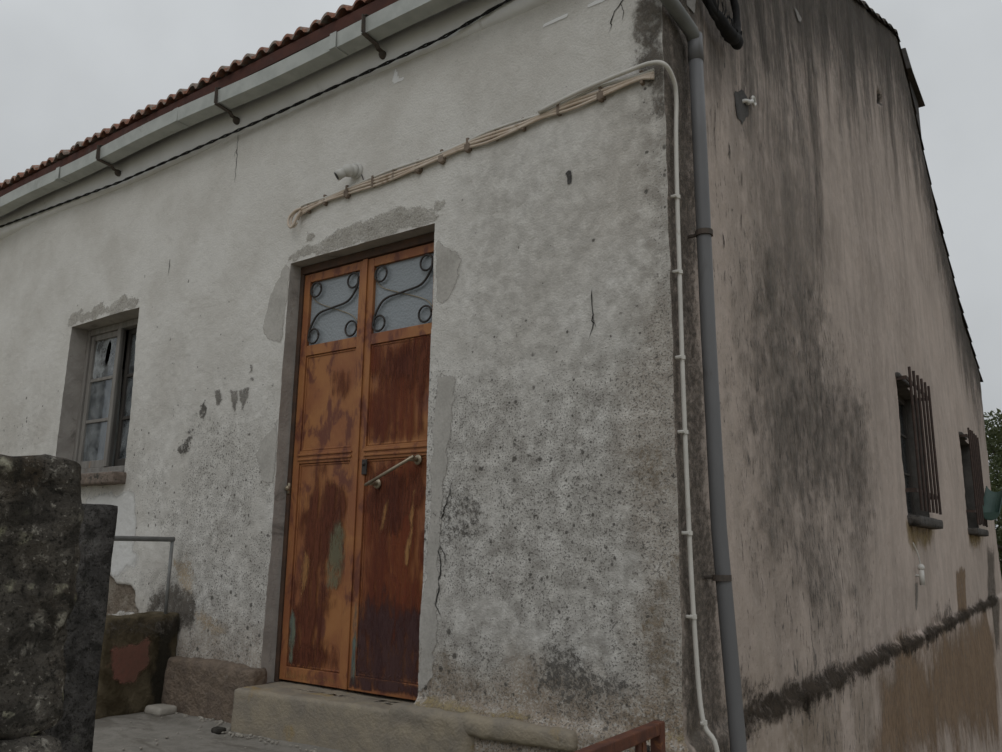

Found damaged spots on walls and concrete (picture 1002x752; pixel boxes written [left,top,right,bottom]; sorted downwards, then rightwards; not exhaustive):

damp [716,0,983,404]
crack [435,483,452,614]
flaking render [106,575,139,615]
damp [927,567,967,645]
peeling [110,637,151,684]